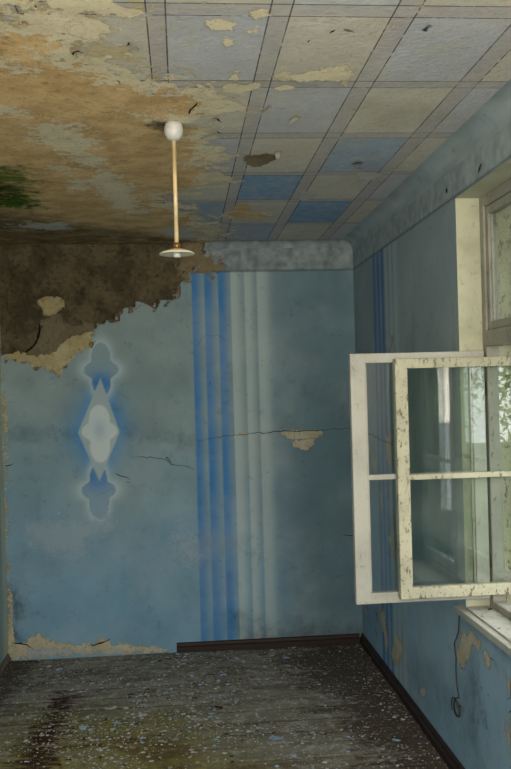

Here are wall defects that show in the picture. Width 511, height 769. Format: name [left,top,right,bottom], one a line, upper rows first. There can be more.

peeling [269,65,354,92]
water stain [0,166,135,244]
peeling [0,0,282,378]
crack [197,428,349,442]
peeling [280,429,323,451]
flaking render [1,373,171,660]
peeling [456,629,490,671]